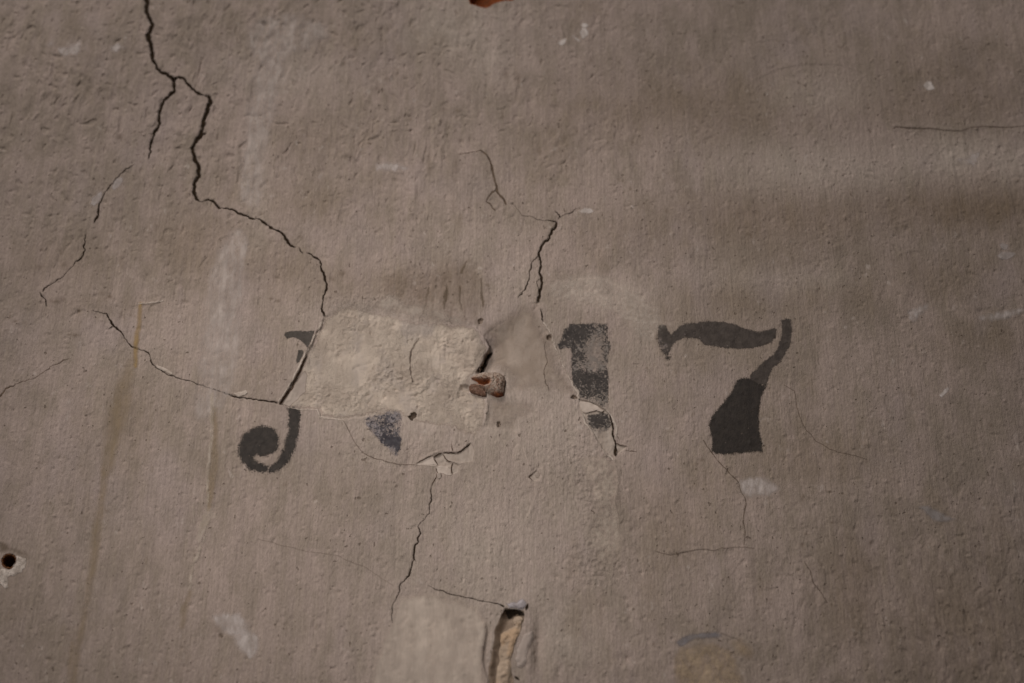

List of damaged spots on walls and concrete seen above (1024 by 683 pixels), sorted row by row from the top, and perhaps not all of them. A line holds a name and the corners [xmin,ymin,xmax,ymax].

crack [40,0,328,316]
crack [469,150,506,210]
crack [518,210,574,321]
crack [96,311,277,403]
flaking render [278,297,627,483]
spalling [0,556,26,589]
crack [391,489,432,619]
crack [433,588,504,607]
flaking render [488,599,534,683]